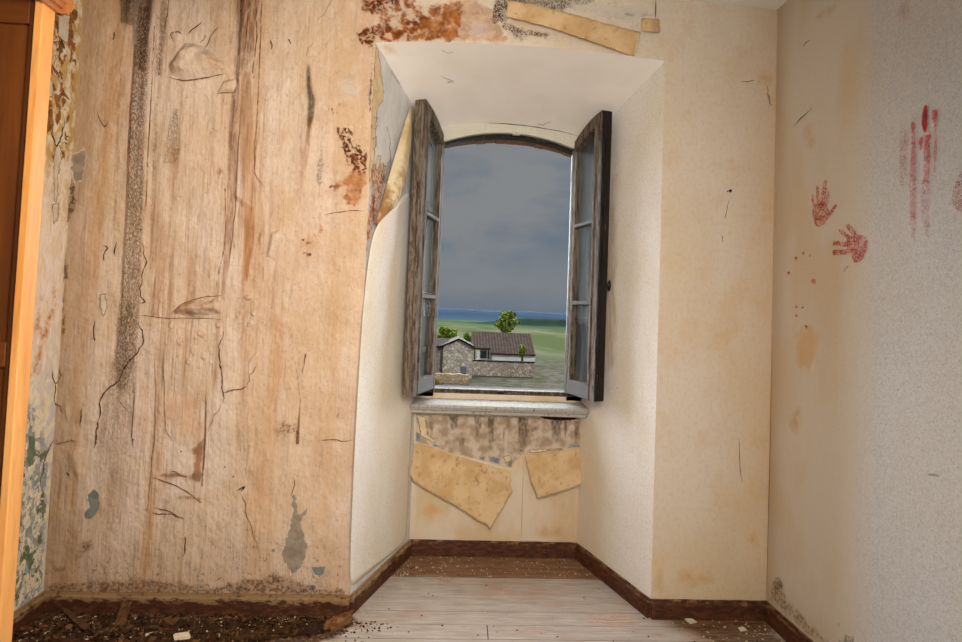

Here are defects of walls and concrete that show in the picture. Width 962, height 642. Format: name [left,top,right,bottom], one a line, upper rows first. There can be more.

water stain [122,0,162,167]
peeling [369,47,384,182]
crack [40,246,256,486]
peeling [15,401,48,607]
flaking render [83,489,100,521]
flaking render [270,494,343,593]
flaking render [415,413,581,468]